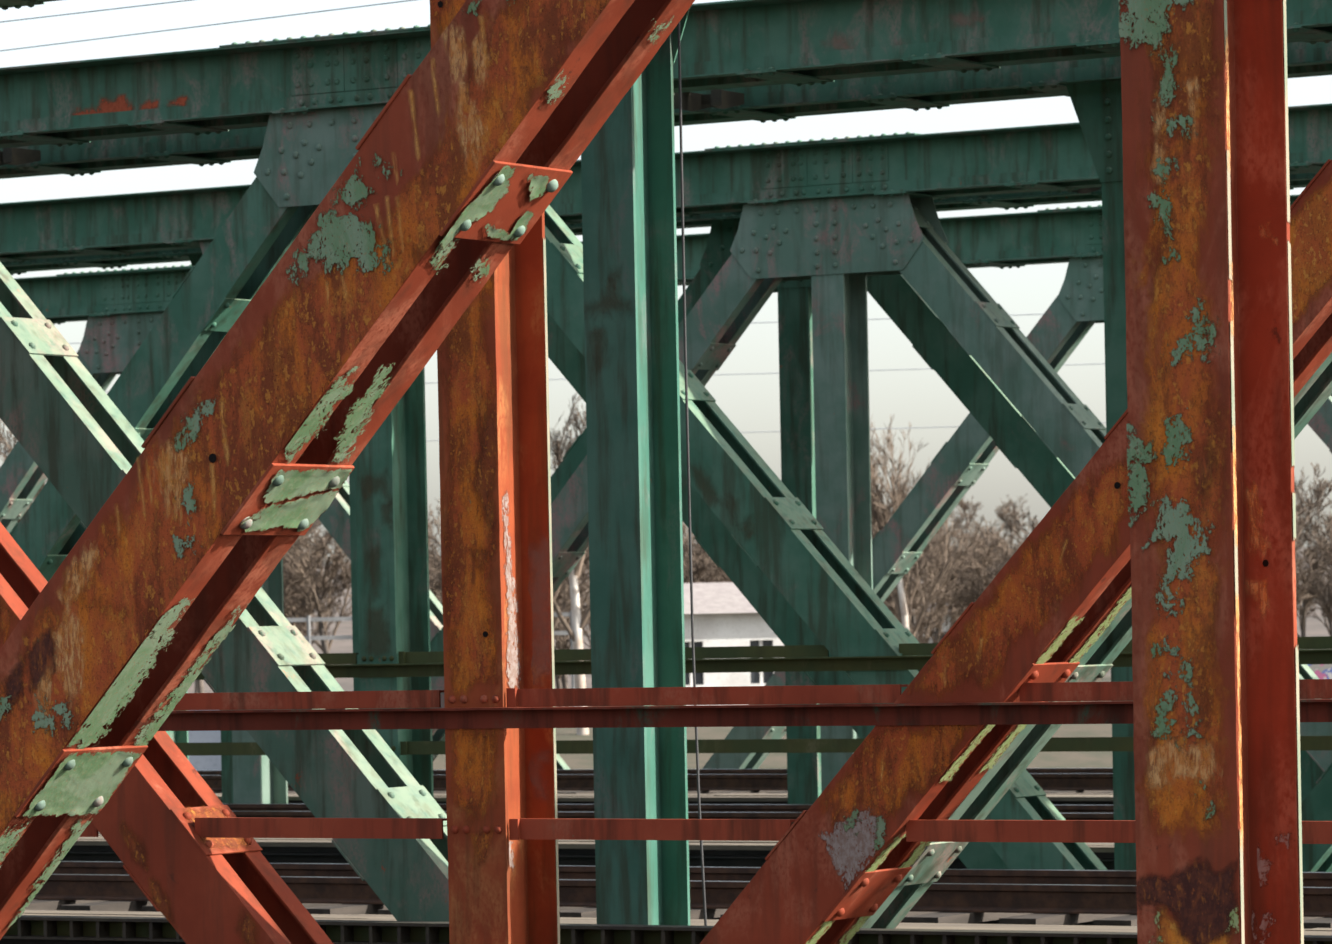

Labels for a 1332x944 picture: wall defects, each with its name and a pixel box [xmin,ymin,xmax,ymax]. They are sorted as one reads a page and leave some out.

peeling [286,153,403,286]
peeling [1118,0,1200,266]
corrosion [0,0,607,831]
corrosion [909,460,1129,695]
peeling [1036,587,1132,664]
peeling [1126,407,1215,618]
peeling [1165,297,1235,448]
corrosion [1135,0,1268,944]
peeling [0,594,250,928]
corrosion [186,807,248,849]
peeling [818,807,931,890]
peeling [937,724,1026,785]